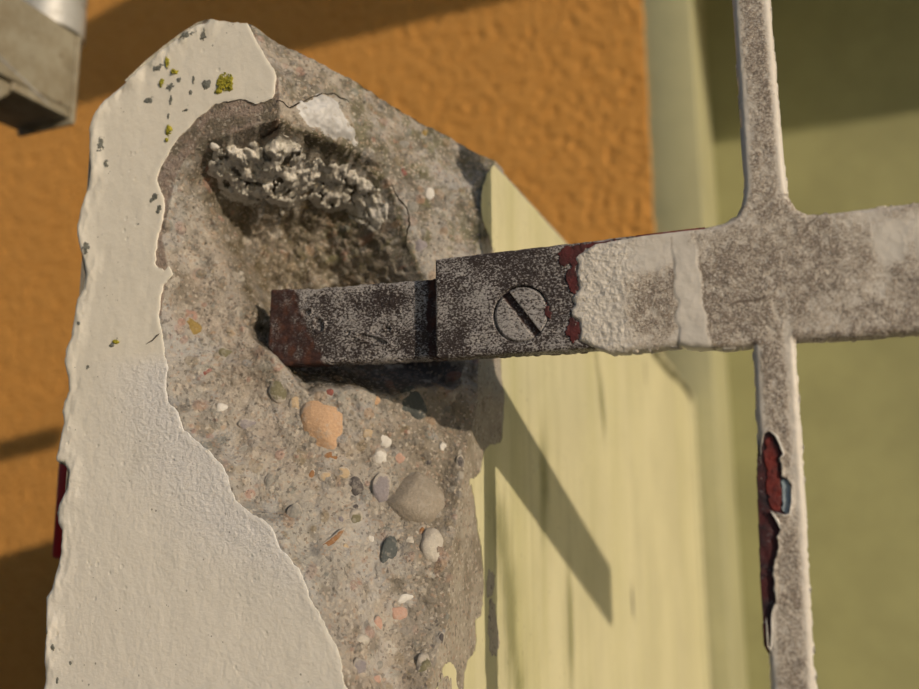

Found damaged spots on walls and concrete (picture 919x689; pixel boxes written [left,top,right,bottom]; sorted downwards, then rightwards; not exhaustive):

spalling [155,24,504,689]